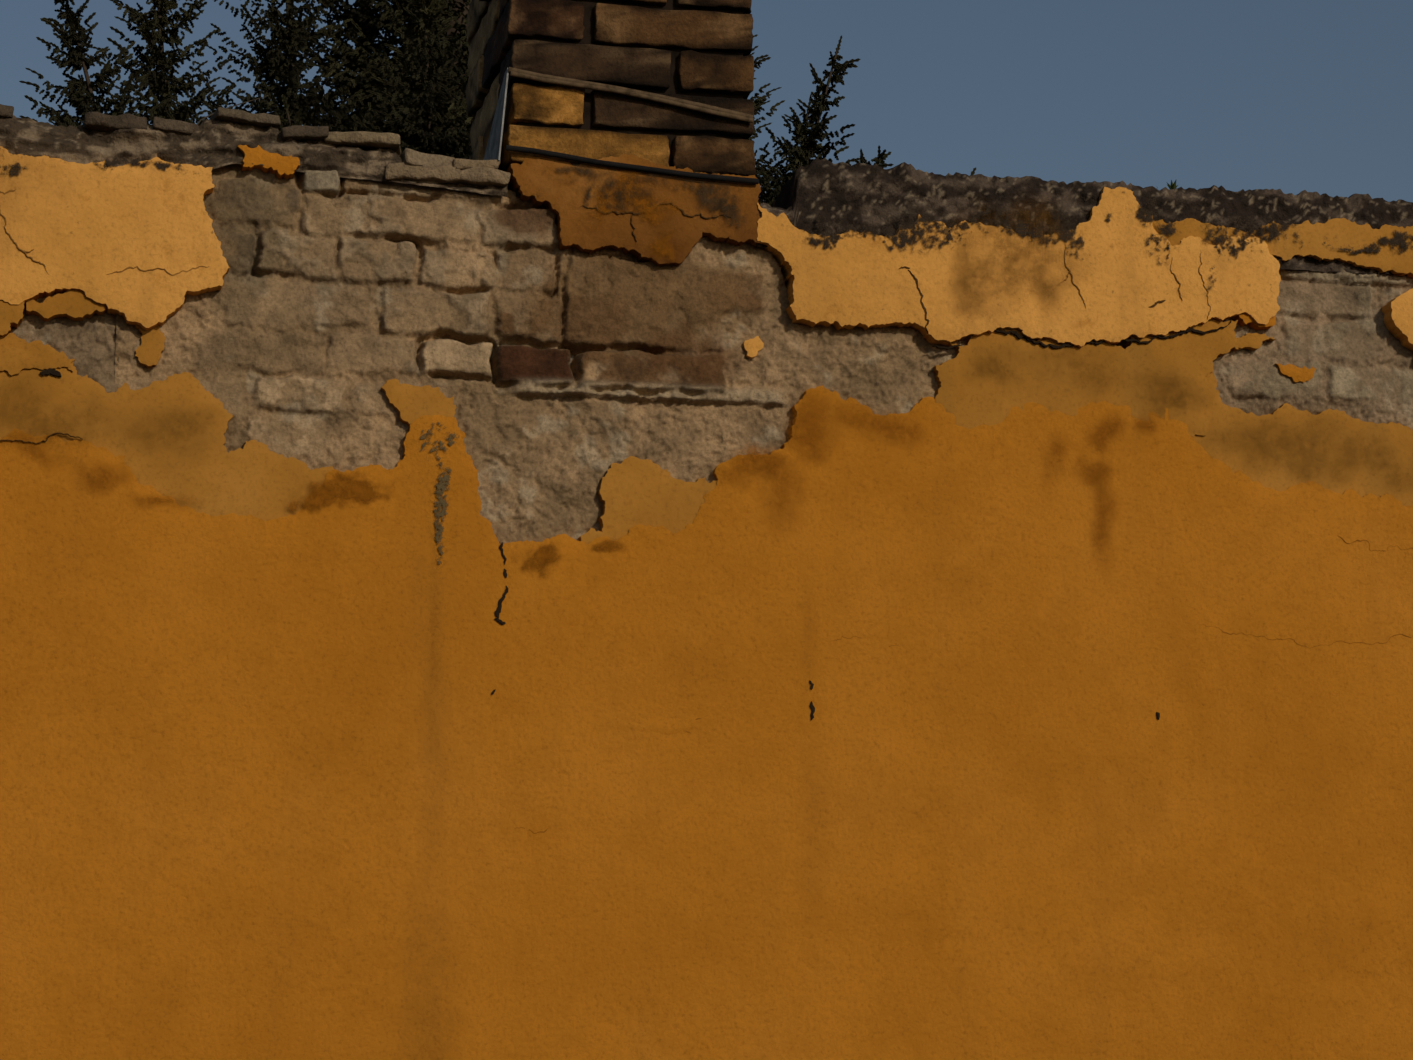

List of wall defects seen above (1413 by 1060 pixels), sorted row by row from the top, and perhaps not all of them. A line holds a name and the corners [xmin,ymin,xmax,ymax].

spalling [0,104,14,118]
water stain [0,162,26,177]
water stain [96,158,181,170]
water stain [805,200,1084,260]
water stain [1136,197,1176,264]
water stain [1205,217,1303,289]
water stain [1324,230,1413,254]
spalling [0,107,1413,565]
crack [494,542,508,625]